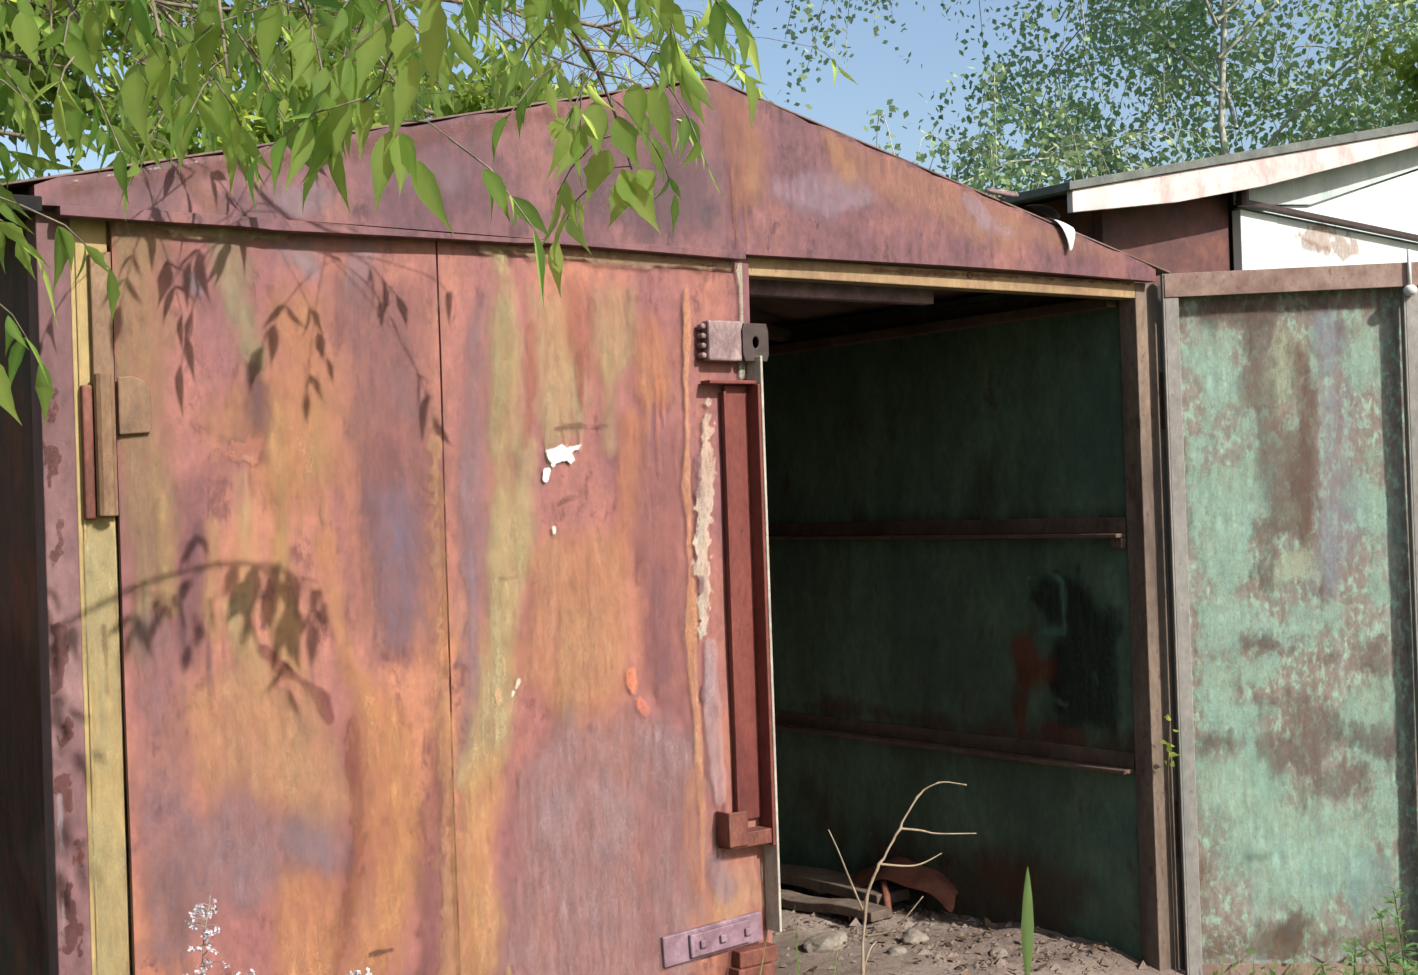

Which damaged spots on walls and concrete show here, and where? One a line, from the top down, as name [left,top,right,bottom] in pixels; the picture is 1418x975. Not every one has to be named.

rust [165,225,286,240]
rust [238,566,369,975]
rust [440,487,526,796]
peeling [543,445,580,482]
rust [627,669,649,714]
rust [683,289,691,535]
rust [685,573,705,890]
peeling [692,399,722,804]